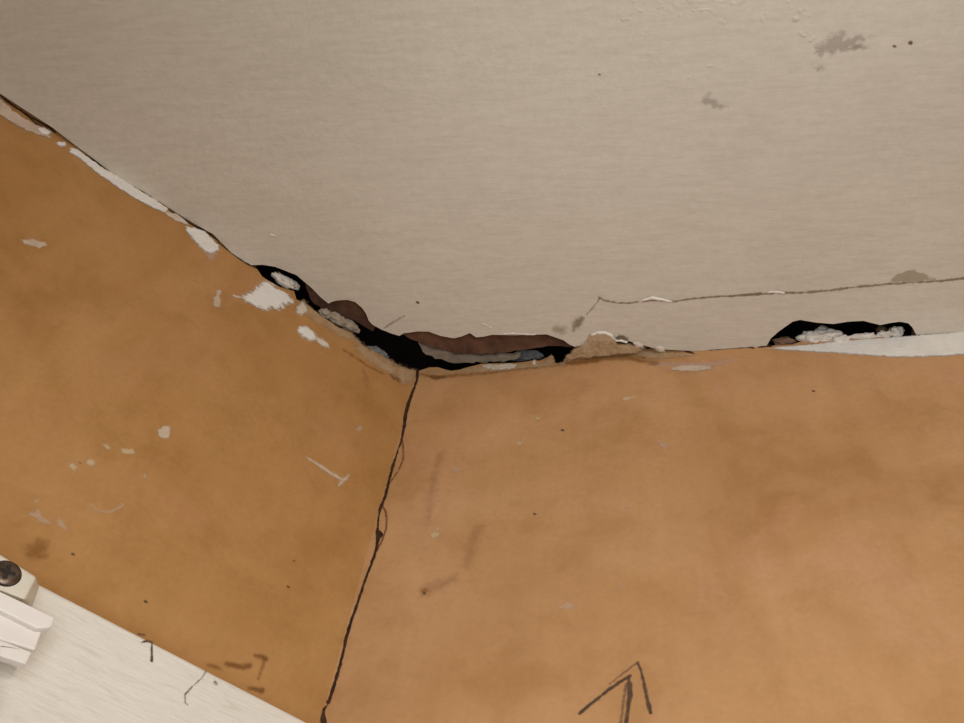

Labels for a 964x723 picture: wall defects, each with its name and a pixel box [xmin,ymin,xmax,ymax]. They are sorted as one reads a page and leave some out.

spalling [255,265,692,383]
crack [573,271,964,329]
spalling [767,320,912,346]
crack [320,369,419,723]